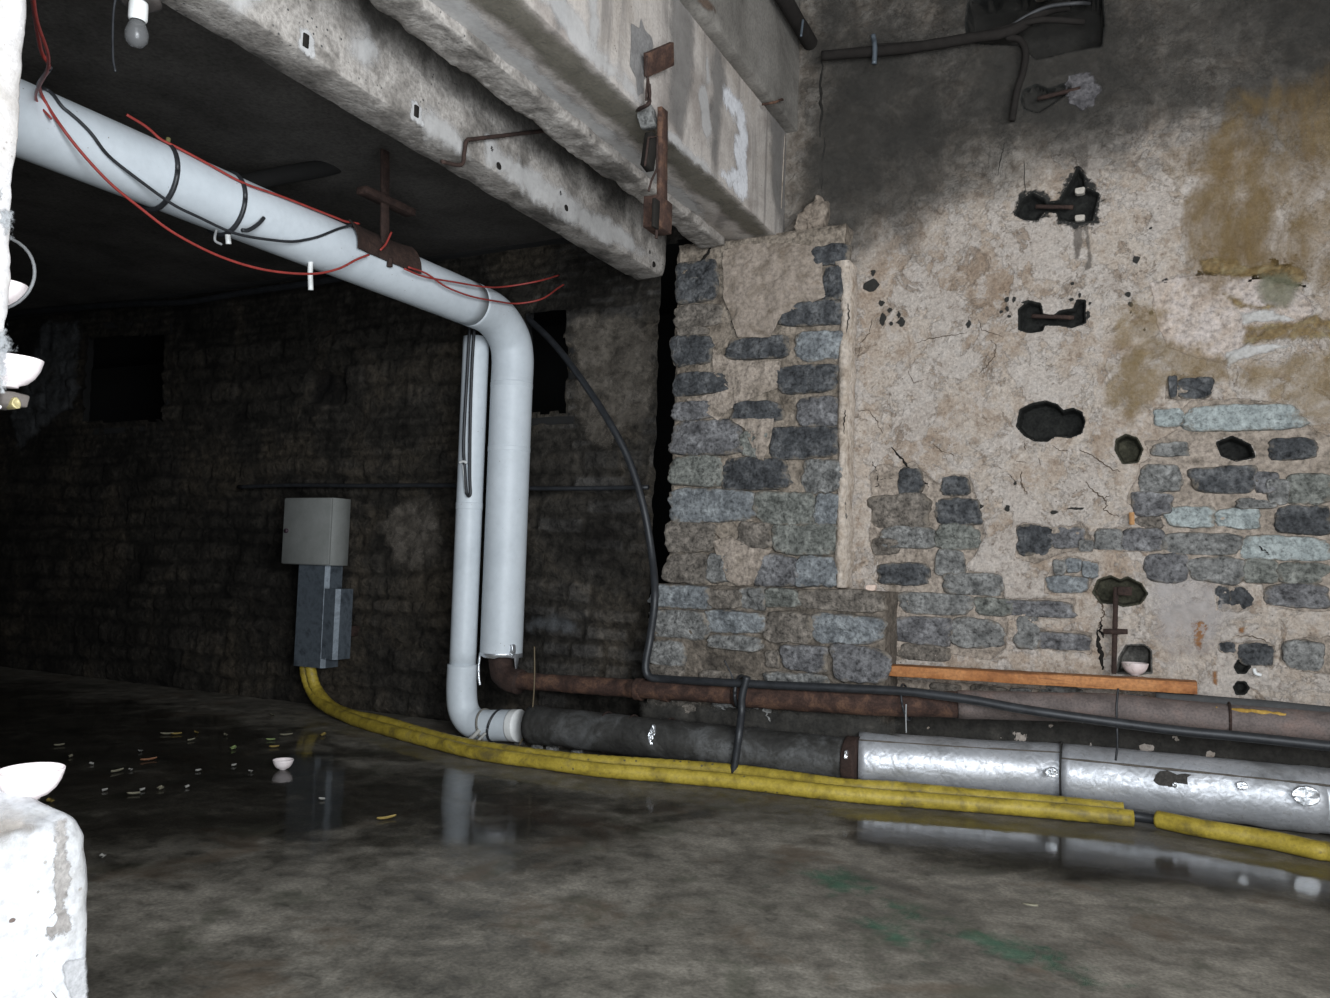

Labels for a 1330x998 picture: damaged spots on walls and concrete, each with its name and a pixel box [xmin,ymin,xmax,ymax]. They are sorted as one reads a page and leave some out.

leakage [813,0,1330,229]
flaking render [722,243,825,338]
leakage [1074,225,1091,270]
spalling [863,257,1330,662]
spalling [1116,644,1153,675]
spalling [1218,636,1330,674]